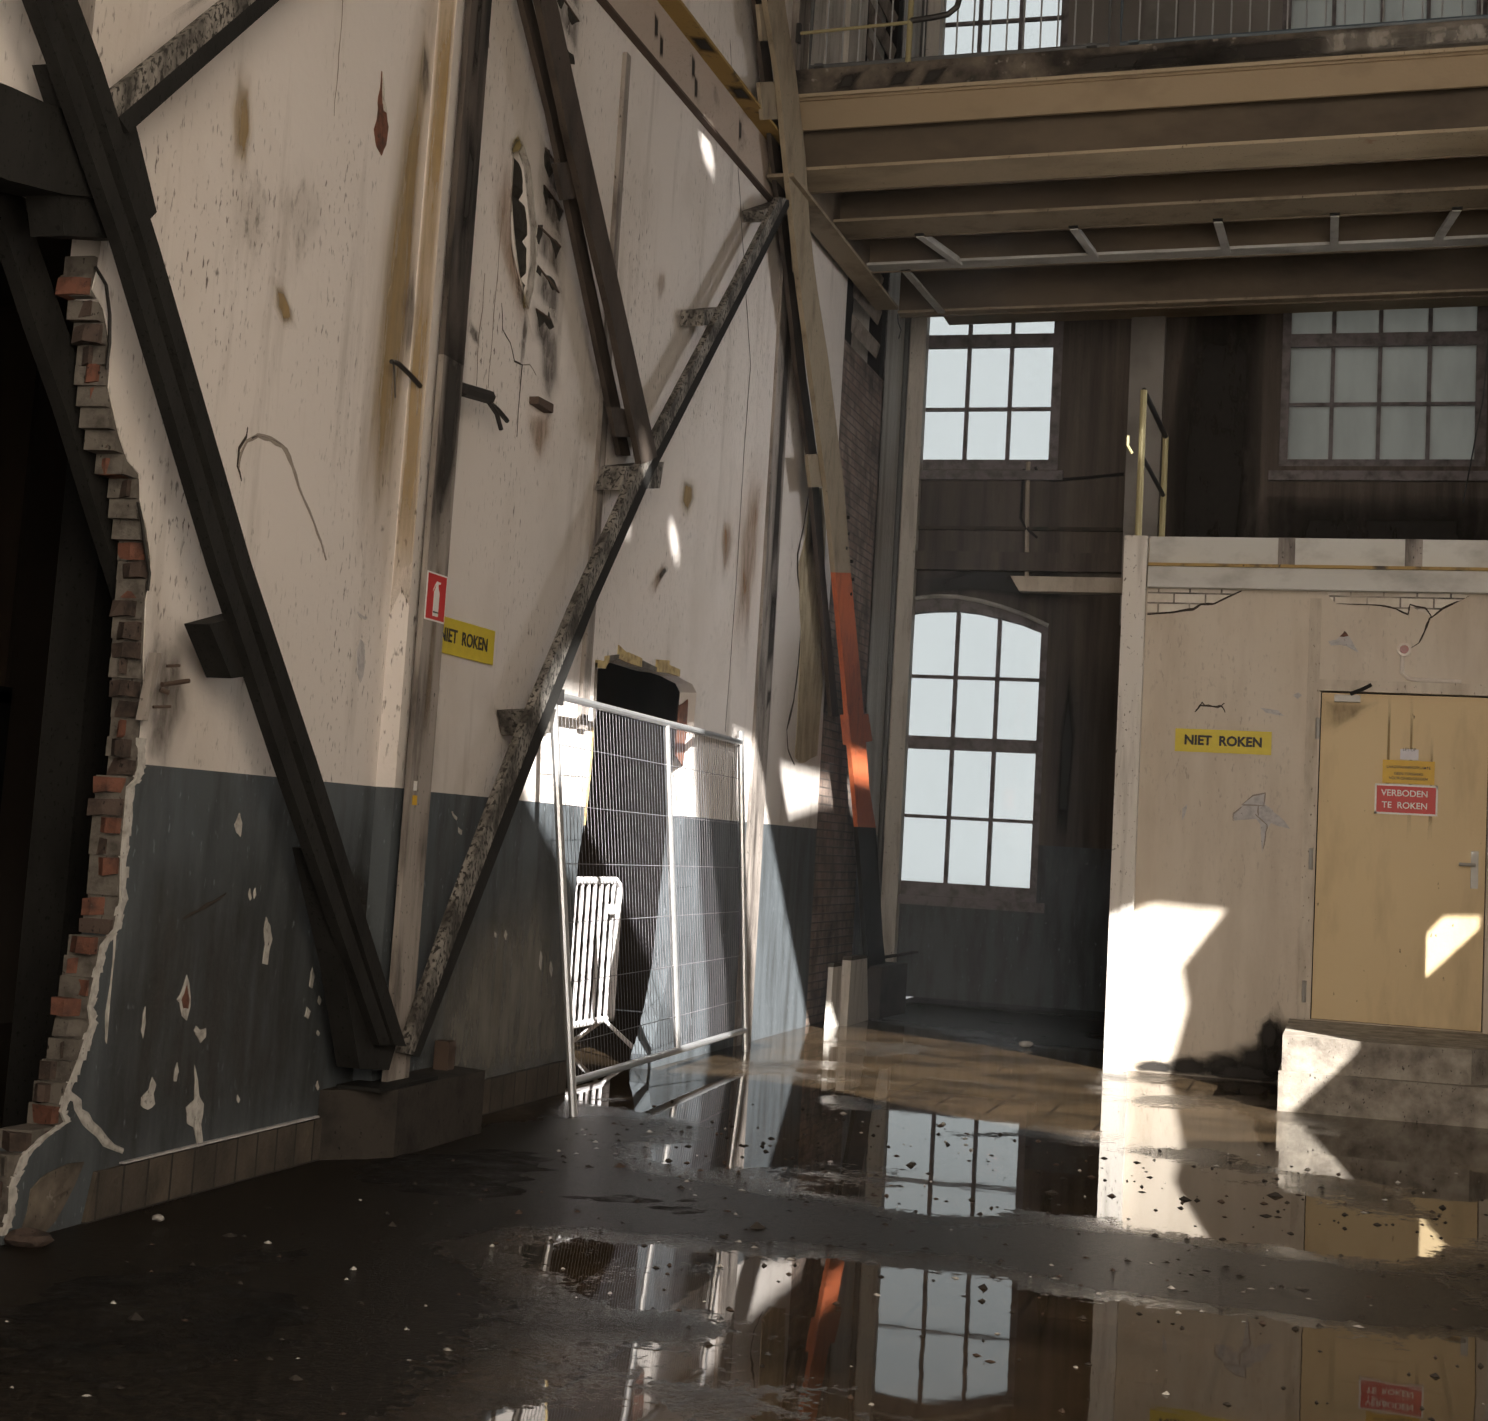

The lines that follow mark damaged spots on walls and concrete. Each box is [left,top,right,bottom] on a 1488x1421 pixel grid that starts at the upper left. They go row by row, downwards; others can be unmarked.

crack [237,427,327,561]
spalling [1147,588,1242,615]
crack [1411,595,1469,648]
peeling [234,813,242,837]
peeling [1233,792,1290,850]
peeling [262,917,273,965]
peeling [105,916,116,1043]
peeling [176,975,206,1043]
peeling [304,968,321,1036]
peeling [140,1063,204,1147]